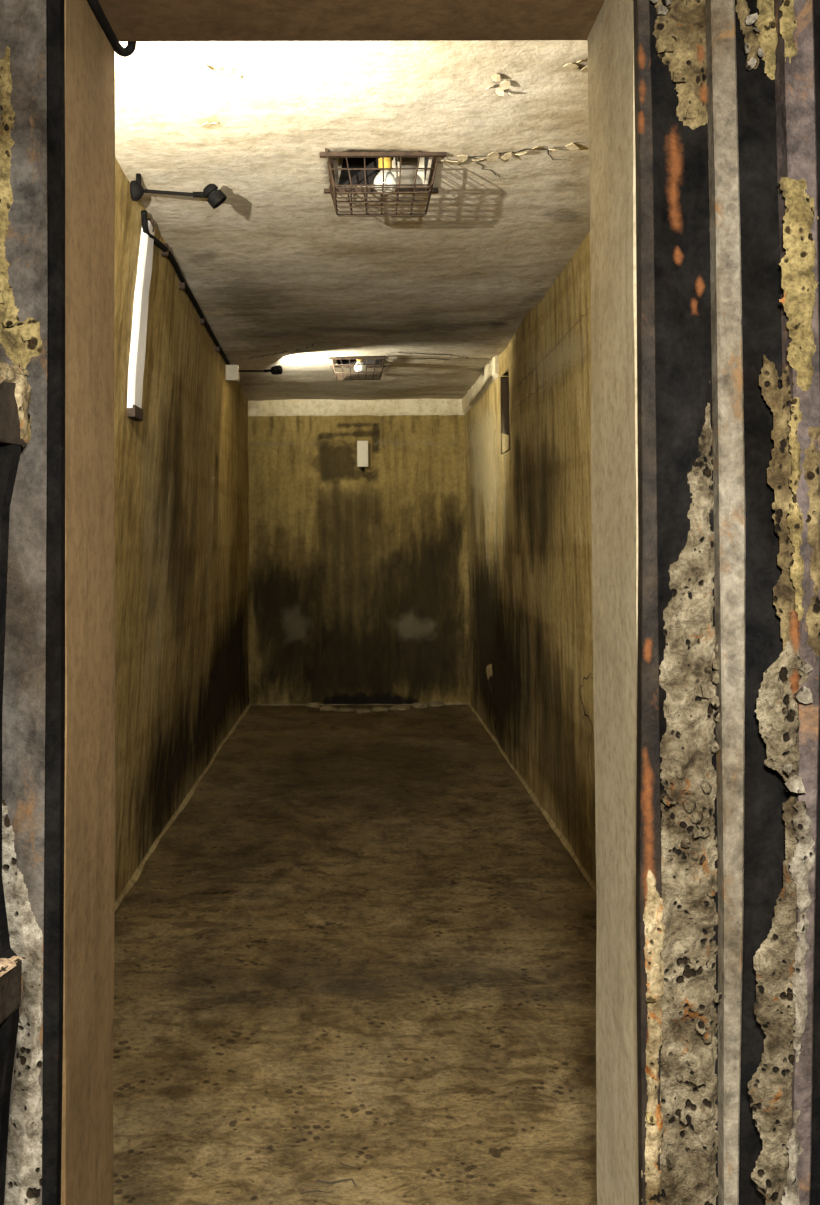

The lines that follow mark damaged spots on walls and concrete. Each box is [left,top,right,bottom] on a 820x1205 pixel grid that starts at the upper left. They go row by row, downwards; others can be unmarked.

peeling [0,46,42,447]
rust [670,135,680,226]
peeling [736,0,798,80]
peeling [0,799,43,1205]
water stain [137,516,536,857]
peeling [641,403,722,1205]
peeling [748,177,820,1205]